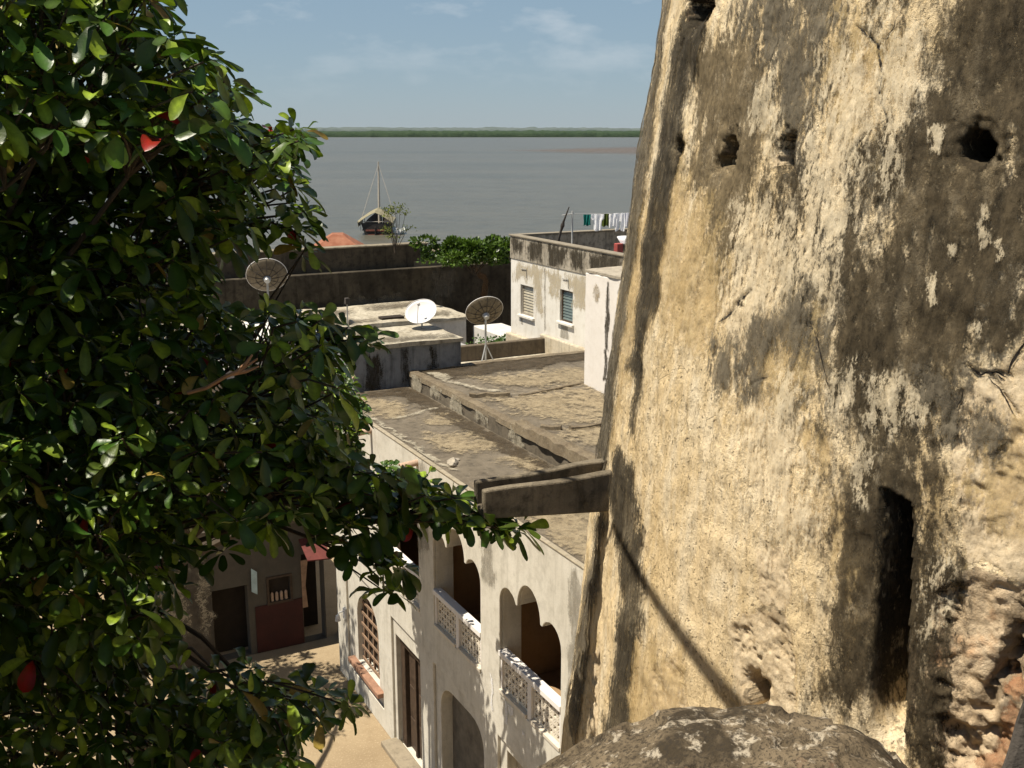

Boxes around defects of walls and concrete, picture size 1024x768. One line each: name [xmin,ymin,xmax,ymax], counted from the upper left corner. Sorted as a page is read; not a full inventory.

damp [401,348,411,383]
damp [362,354,541,474]
damp [470,0,1024,768]
crack [951,344,1024,419]
spalling [906,352,1024,768]